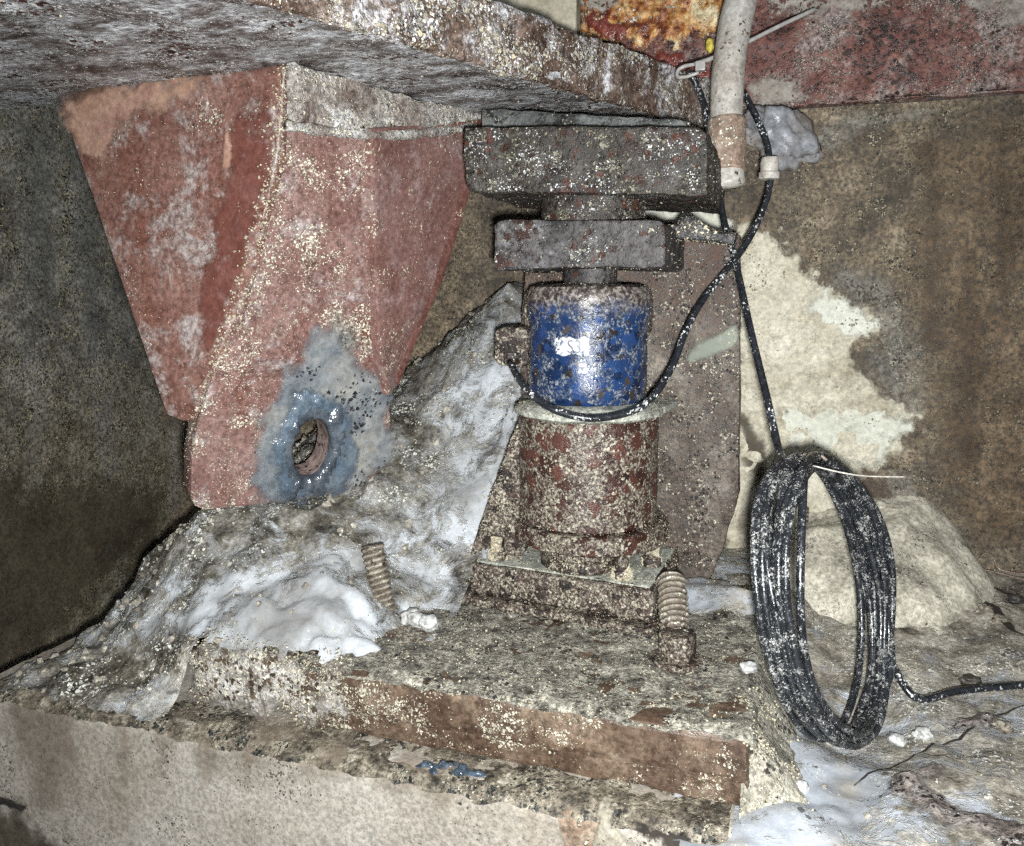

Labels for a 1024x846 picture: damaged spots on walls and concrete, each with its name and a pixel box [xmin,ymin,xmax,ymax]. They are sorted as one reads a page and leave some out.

rust [579,0,723,79]